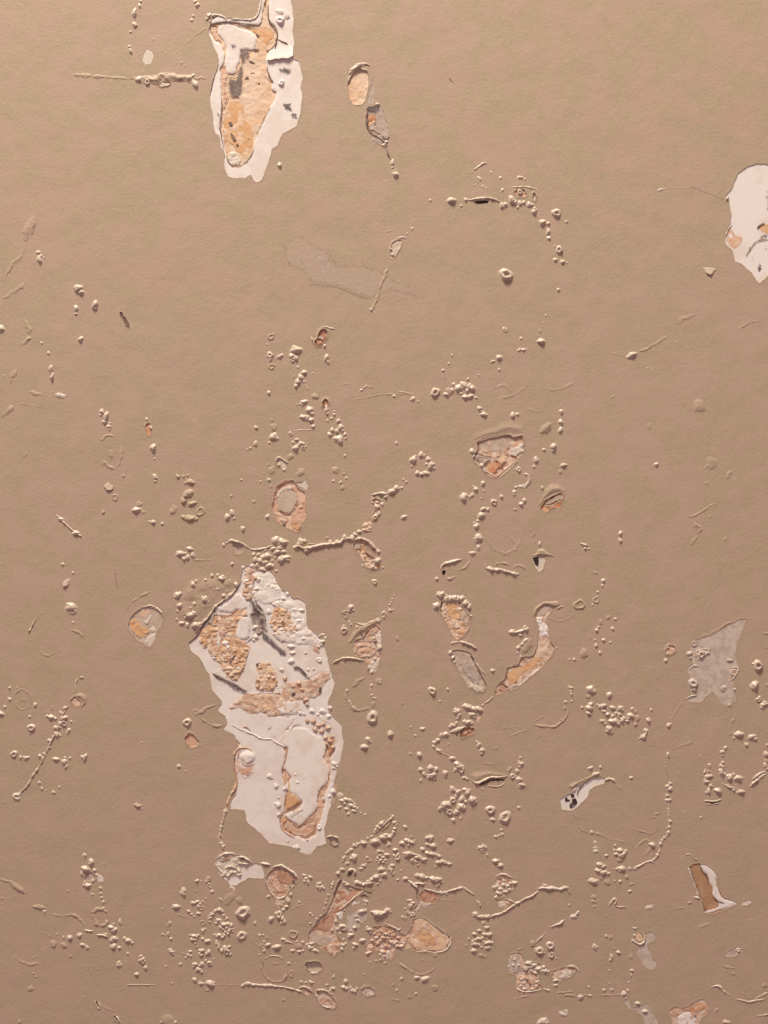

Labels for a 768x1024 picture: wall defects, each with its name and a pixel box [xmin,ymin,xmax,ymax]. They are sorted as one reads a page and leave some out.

peeling [206,0,305,184]
peeling [345,62,400,178]
peeling [723,161,768,285]
peeling [265,477,311,534]
peeling [469,420,527,480]
peeling [126,591,165,649]
peeling [187,563,345,857]
peeling [432,591,574,757]
peeling [662,617,748,709]
peeling [558,765,622,812]
peeling [214,851,481,975]
peeling [686,853,753,916]